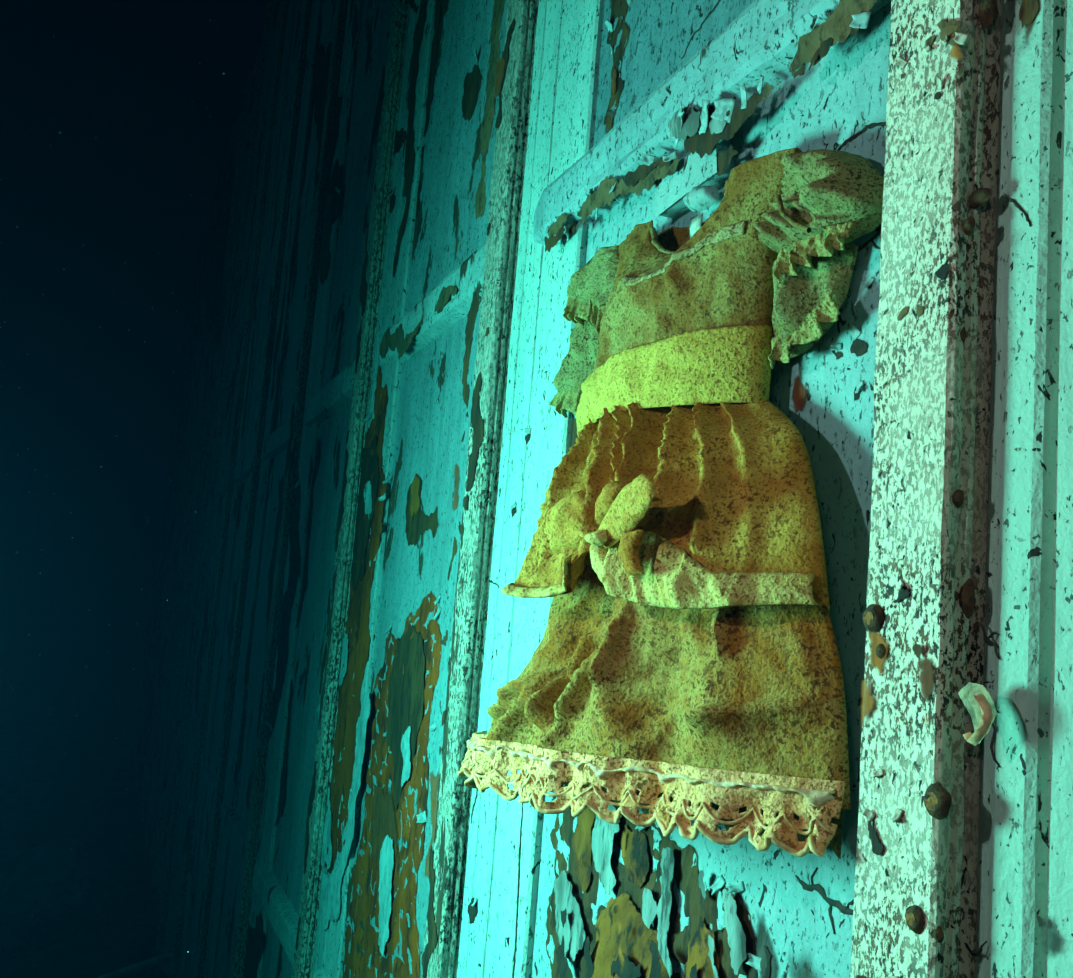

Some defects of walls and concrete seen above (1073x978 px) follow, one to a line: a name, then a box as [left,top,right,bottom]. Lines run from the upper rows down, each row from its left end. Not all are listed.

crack [681,0,720,59]
peeling [790,0,878,78]
spalling [462,49,482,121]
peeling [387,0,441,278]
peeling [544,75,782,252]
peeling [256,438,320,825]
peeling [319,285,457,978]
corrosion [861,680,873,722]
corrosion [869,632,887,674]
corrosion [912,644,933,701]
peeling [546,799,762,978]